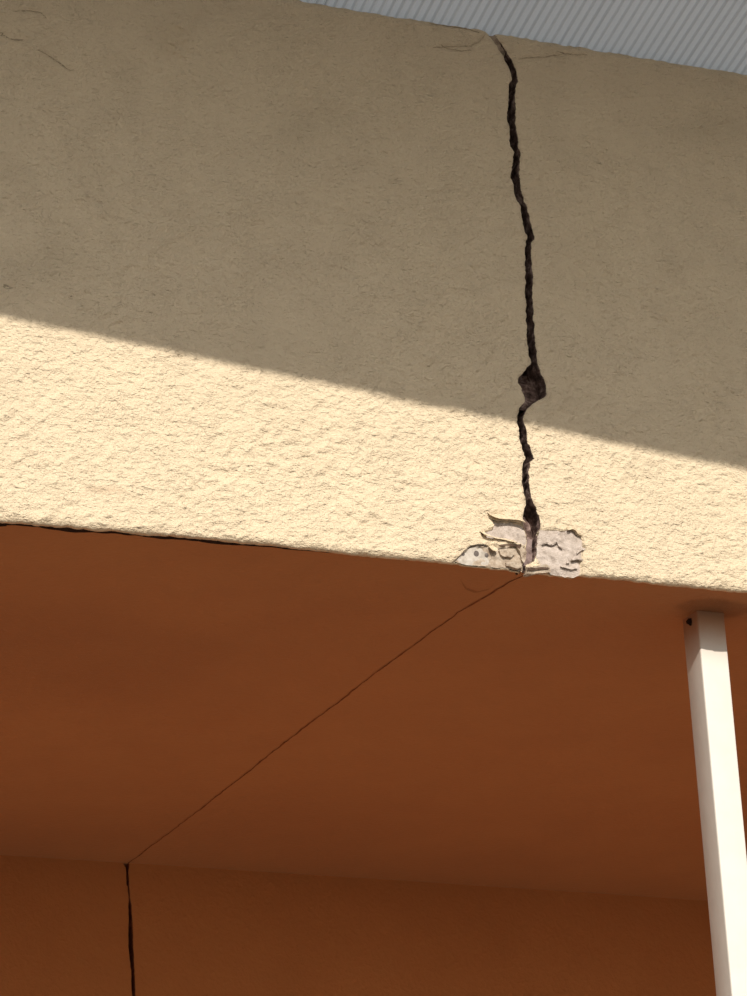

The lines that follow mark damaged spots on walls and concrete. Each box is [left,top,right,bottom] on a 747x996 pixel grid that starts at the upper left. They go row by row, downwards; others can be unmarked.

crack [125,23,587,996]
peeling [454,512,585,578]